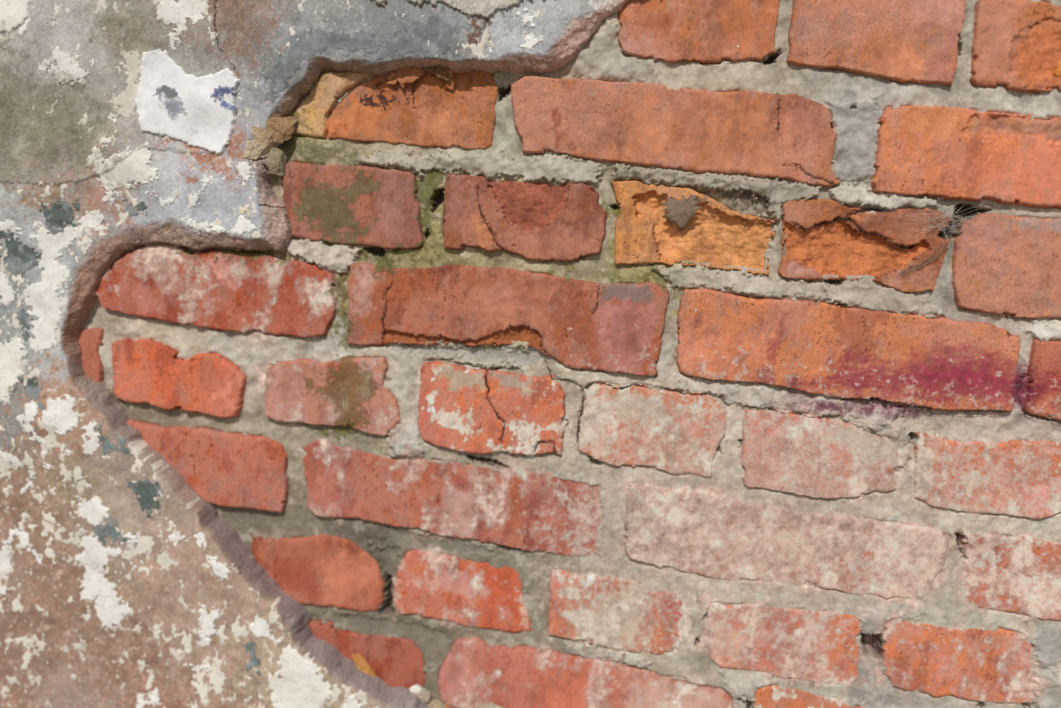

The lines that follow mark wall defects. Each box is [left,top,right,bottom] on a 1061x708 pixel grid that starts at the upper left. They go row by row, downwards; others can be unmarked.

spalling [1009,17,1061,91]
spalling [961,112,1061,145]
crack [477,188,500,247]
spalling [633,191,930,280]
crack [795,208,917,249]
leakage [126,235,211,328]
leakage [241,251,291,345]
leakage [303,271,341,316]
flaking render [0,0,629,708]
crack [429,359,1061,455]